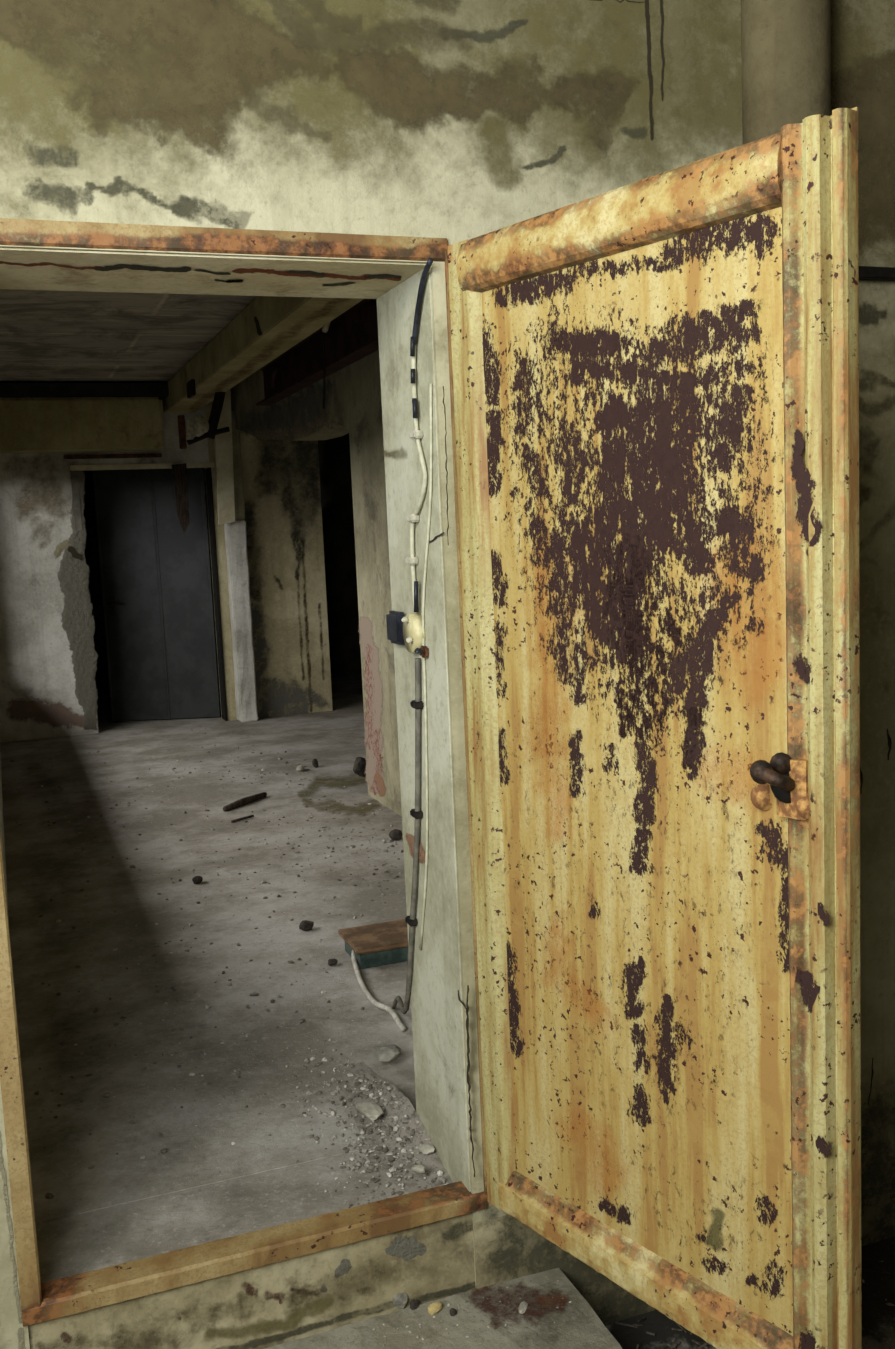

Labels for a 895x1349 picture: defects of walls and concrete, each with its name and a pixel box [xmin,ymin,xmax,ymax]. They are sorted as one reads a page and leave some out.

leakage [0,0,743,187]
leakage [29,176,242,229]
spalling [54,470,98,730]
leakage [243,439,327,718]
leakage [861,1094,895,1245]
leakage [206,1270,392,1349]
leakage [417,1282,475,1302]
rust [471,1283,567,1329]